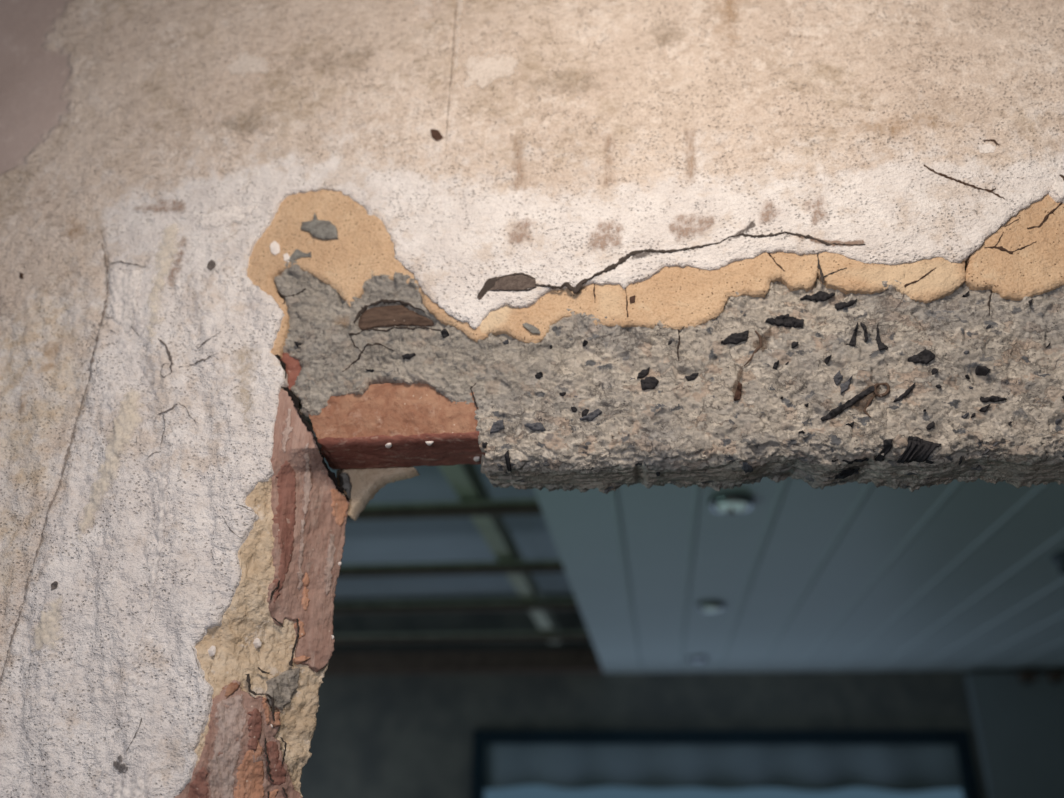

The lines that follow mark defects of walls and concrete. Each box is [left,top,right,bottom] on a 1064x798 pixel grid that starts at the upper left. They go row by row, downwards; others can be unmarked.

flaking render [247,189,1064,360]
crack [477,219,865,317]
crack [677,324,689,361]
flaking render [174,680,303,798]